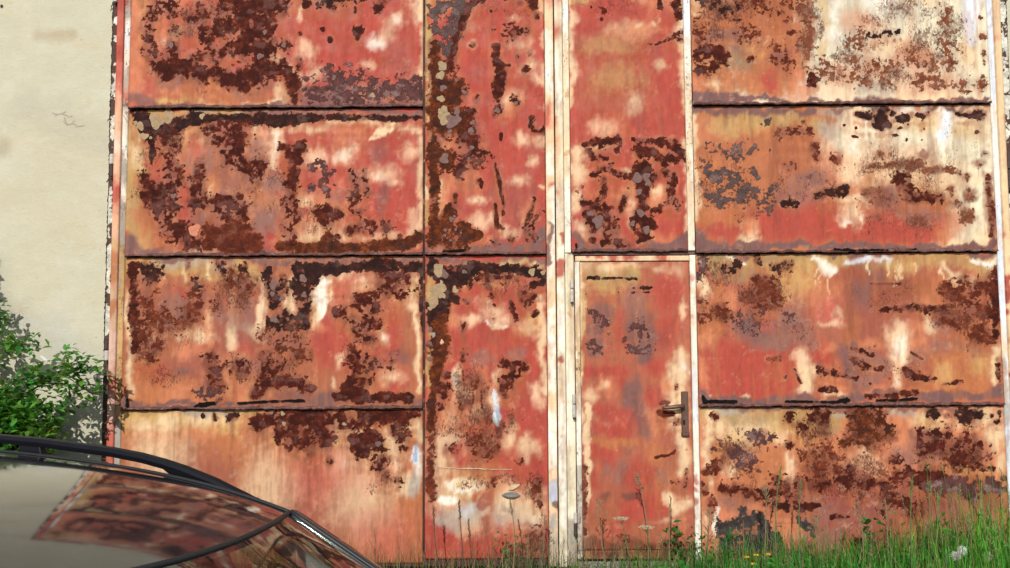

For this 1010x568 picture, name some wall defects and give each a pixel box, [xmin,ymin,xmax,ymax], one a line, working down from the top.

corrosion [649,0,988,95]
corrosion [760,117,843,165]
corrosion [855,106,929,131]
corrosion [955,106,986,121]
corrosion [575,134,800,248]
corrosion [814,149,996,237]
corrosion [126,0,546,502]
corrosion [696,254,798,337]
corrosion [531,477,543,510]
corrosion [701,346,1008,558]